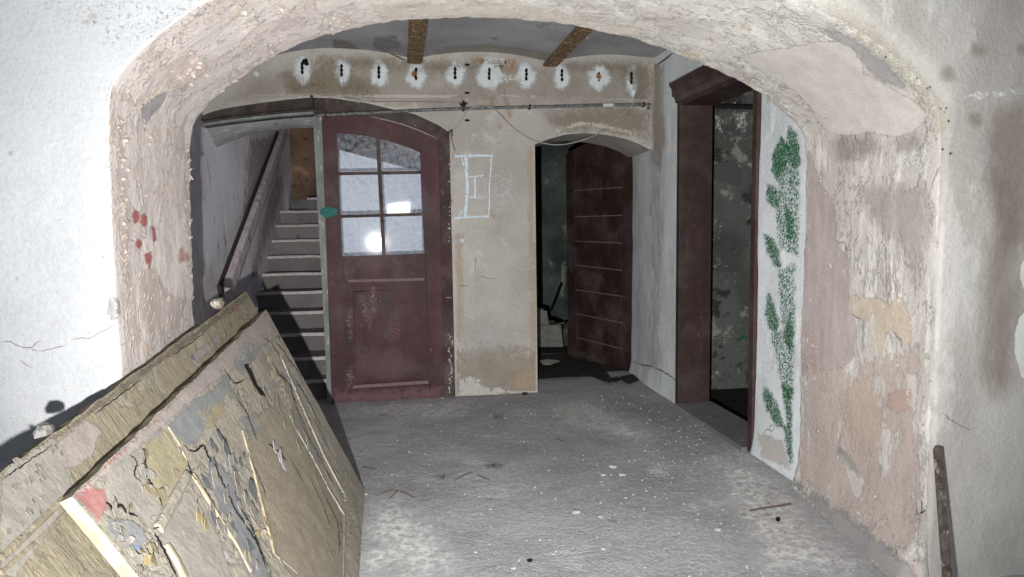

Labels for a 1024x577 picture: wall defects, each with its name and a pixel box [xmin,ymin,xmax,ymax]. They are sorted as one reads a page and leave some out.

peeling [818,29,904,88]
peeling [107,8,309,355]
crack [0,323,118,368]
water stain [457,349,535,394]
peeling [800,150,925,557]